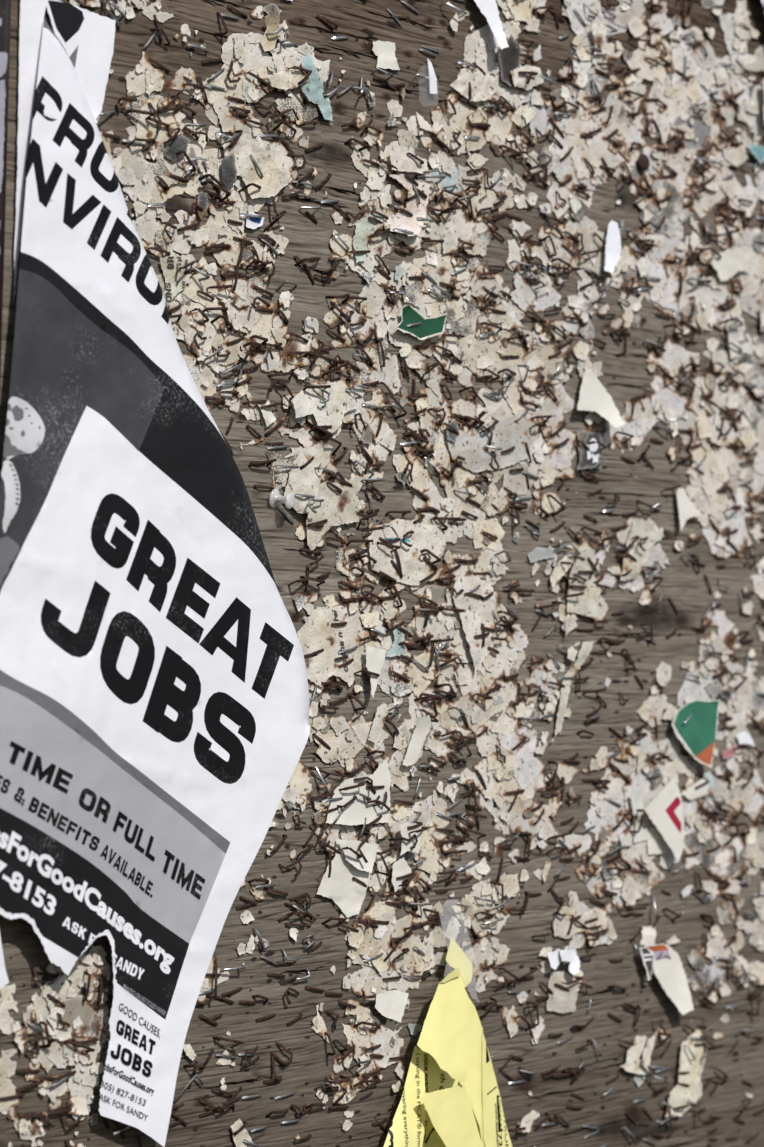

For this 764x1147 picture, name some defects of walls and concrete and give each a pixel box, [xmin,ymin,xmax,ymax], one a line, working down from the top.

rust [282,341,298,366]